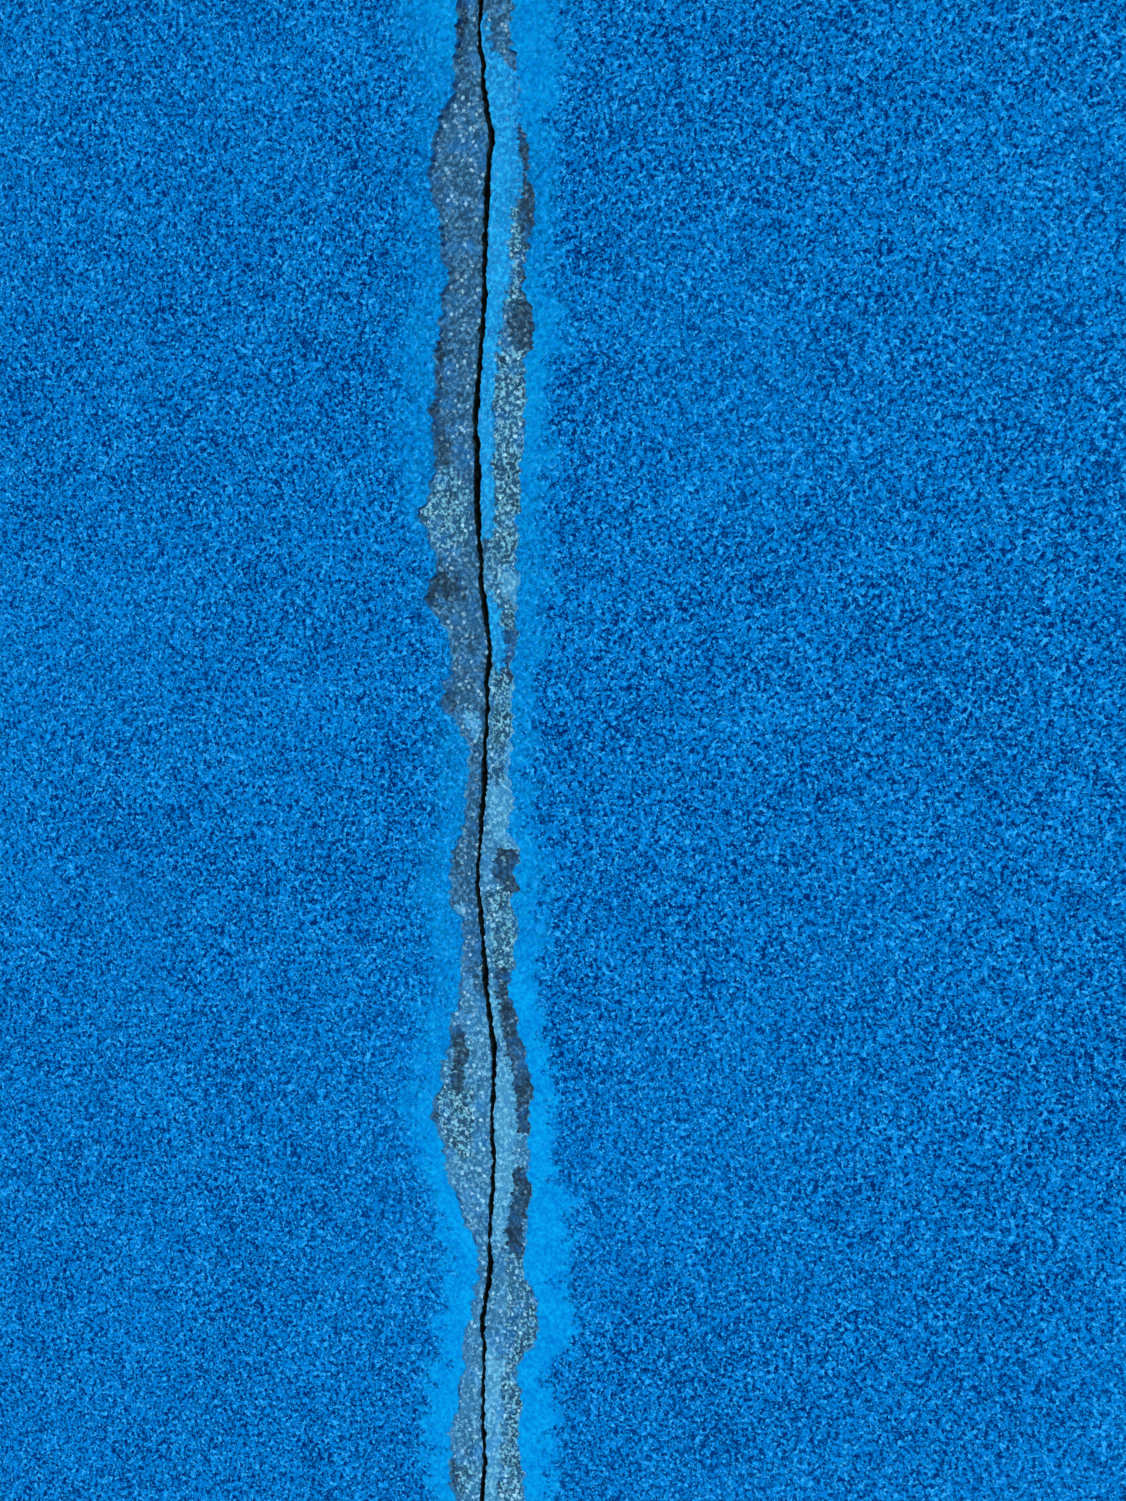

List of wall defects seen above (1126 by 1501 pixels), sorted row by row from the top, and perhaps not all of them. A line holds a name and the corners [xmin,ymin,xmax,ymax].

spalling [417,0,540,1501]
crack [472,0,497,1501]